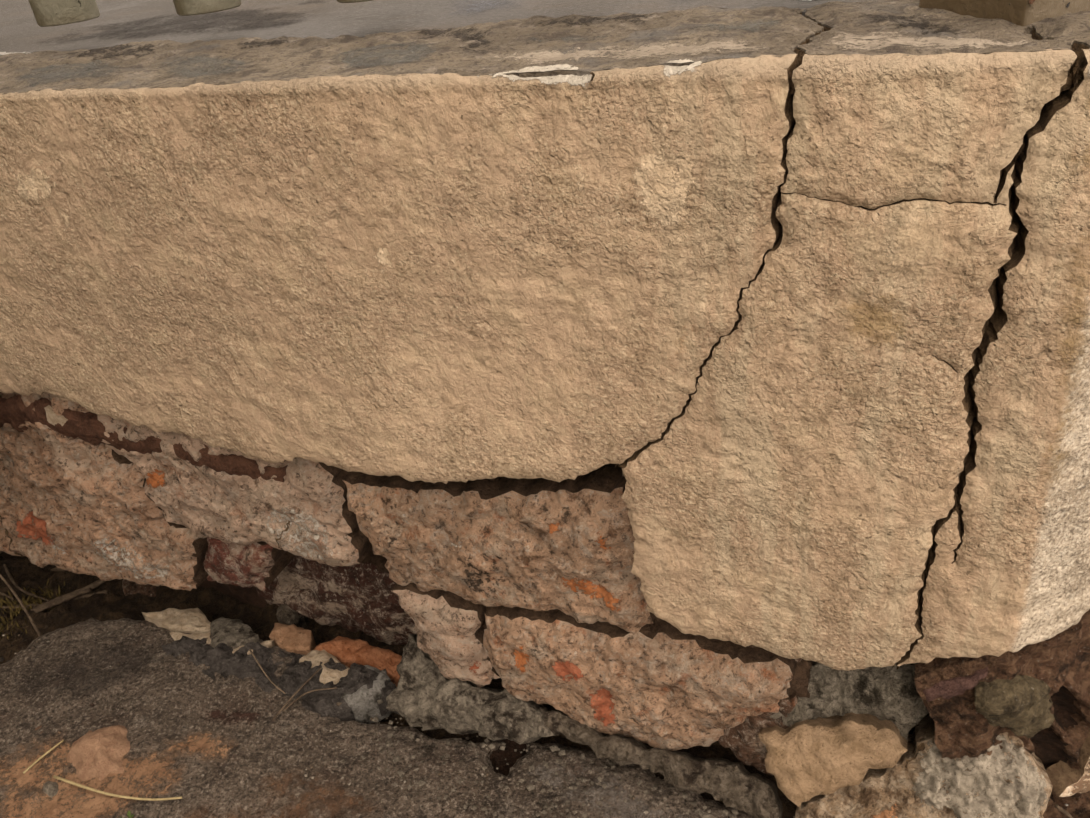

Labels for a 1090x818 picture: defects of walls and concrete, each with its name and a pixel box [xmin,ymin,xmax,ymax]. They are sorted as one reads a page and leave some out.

crack [615,13,1089,669]
spalling [0,394,288,482]
peeling [561,577,621,612]
peeling [589,688,616,727]
spalling [913,609,1090,818]